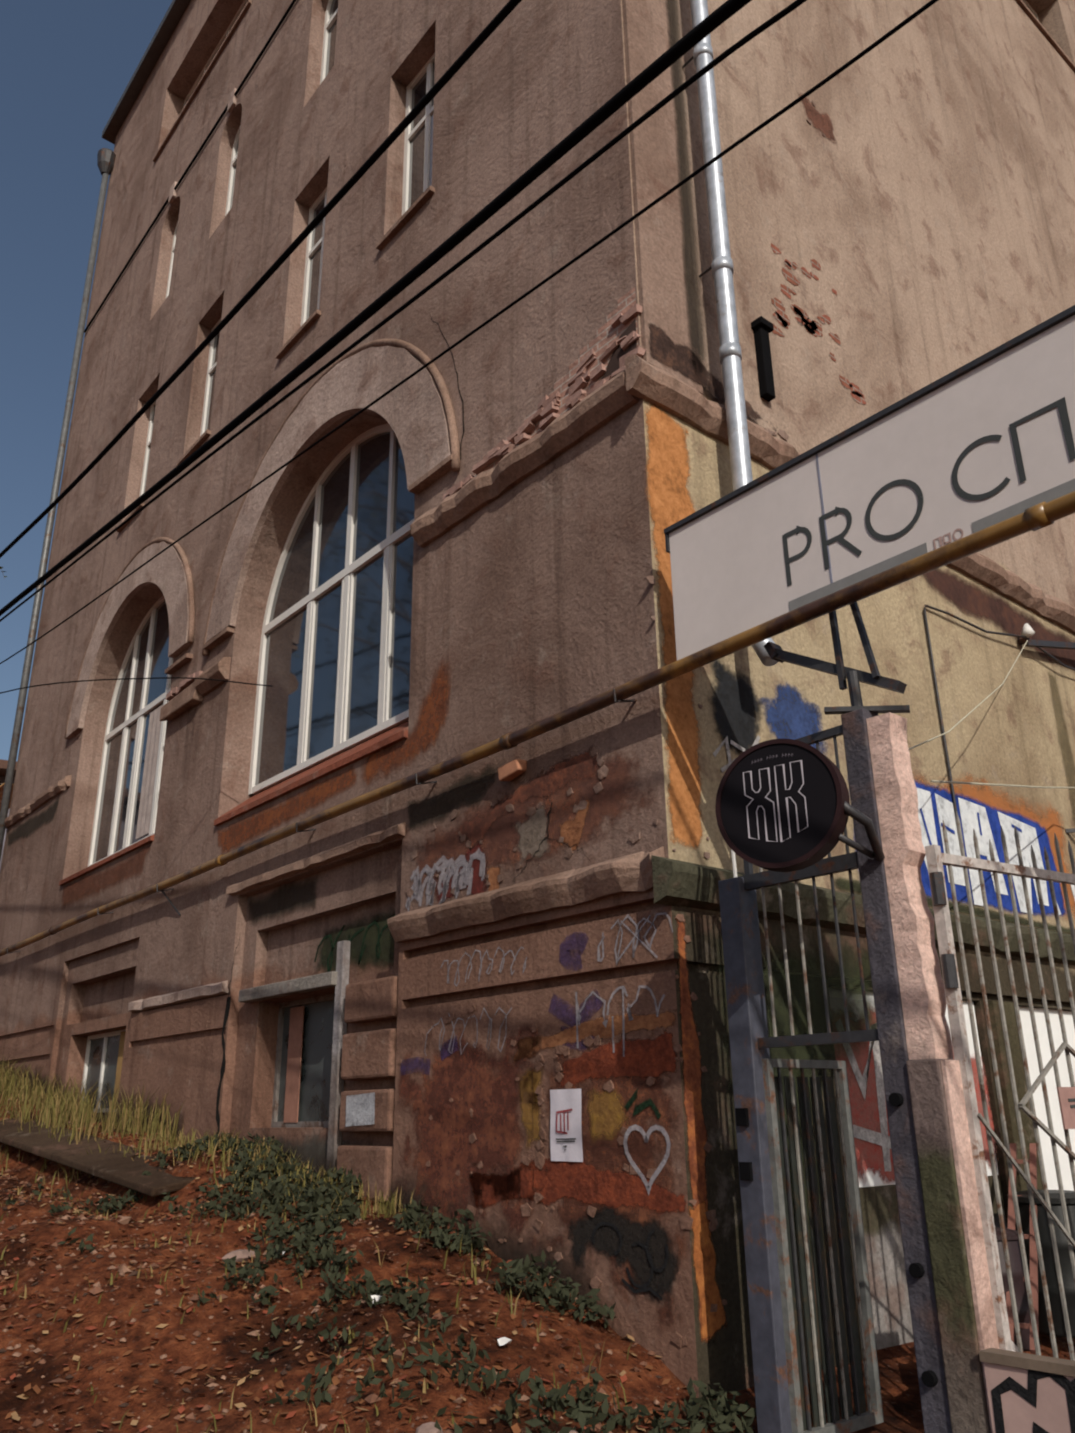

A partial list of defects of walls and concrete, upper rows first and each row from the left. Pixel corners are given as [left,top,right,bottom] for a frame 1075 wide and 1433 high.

peeling [474,287,725,477]
peeling [745,400,789,441]
flaking render [771,243,866,404]
flaking render [628,405,710,859]
flaking render [406,746,650,901]
water stain [3,1070,180,1141]
water stain [376,1182,678,1312]